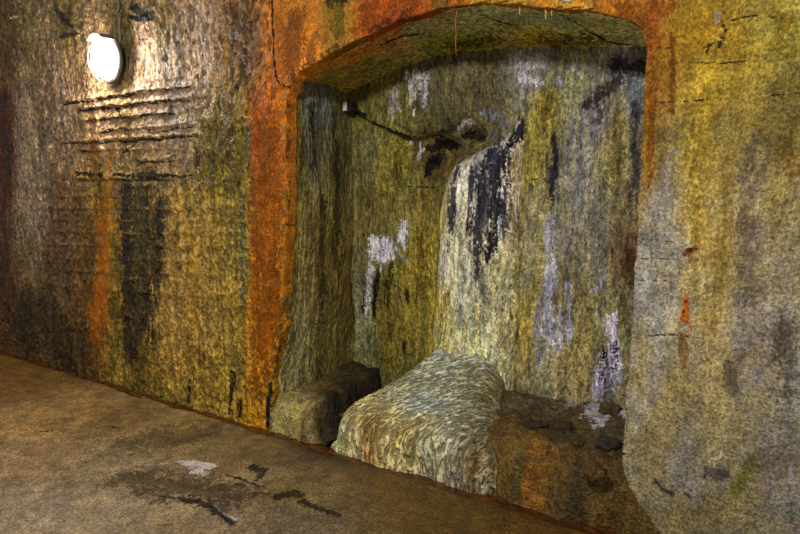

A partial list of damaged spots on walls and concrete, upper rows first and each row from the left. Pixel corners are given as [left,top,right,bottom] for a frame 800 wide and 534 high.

crack [62,85,198,179]
rust [279,1,320,82]
water stain [387,69,429,122]
rust [614,0,677,114]
rust [86,113,116,364]
water stain [0,65,248,405]
rust [248,89,306,394]
water stain [361,218,431,319]
water stain [441,29,612,365]
water stain [579,305,626,429]
rust [680,293,692,340]
water stain [96,462,270,512]